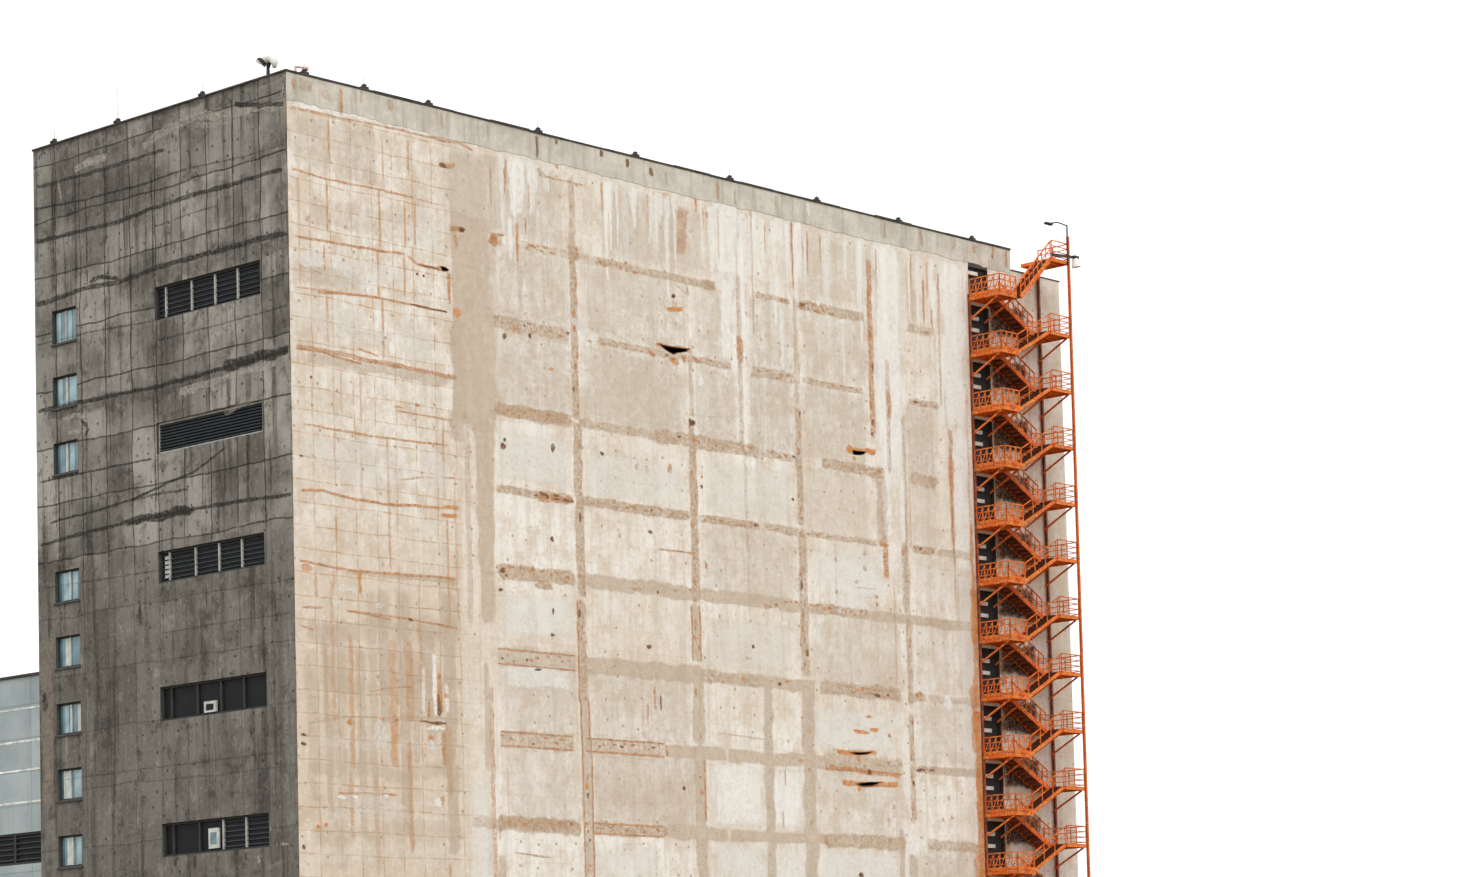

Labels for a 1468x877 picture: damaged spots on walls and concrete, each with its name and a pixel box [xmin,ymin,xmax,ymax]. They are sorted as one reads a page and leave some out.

water stain [34,73,444,336]
spalling [649,342,704,386]
spalling [846,445,876,461]
rust [313,571,356,840]
rust [381,625,454,851]
peeling [714,762,918,877]
spalling [832,749,901,791]